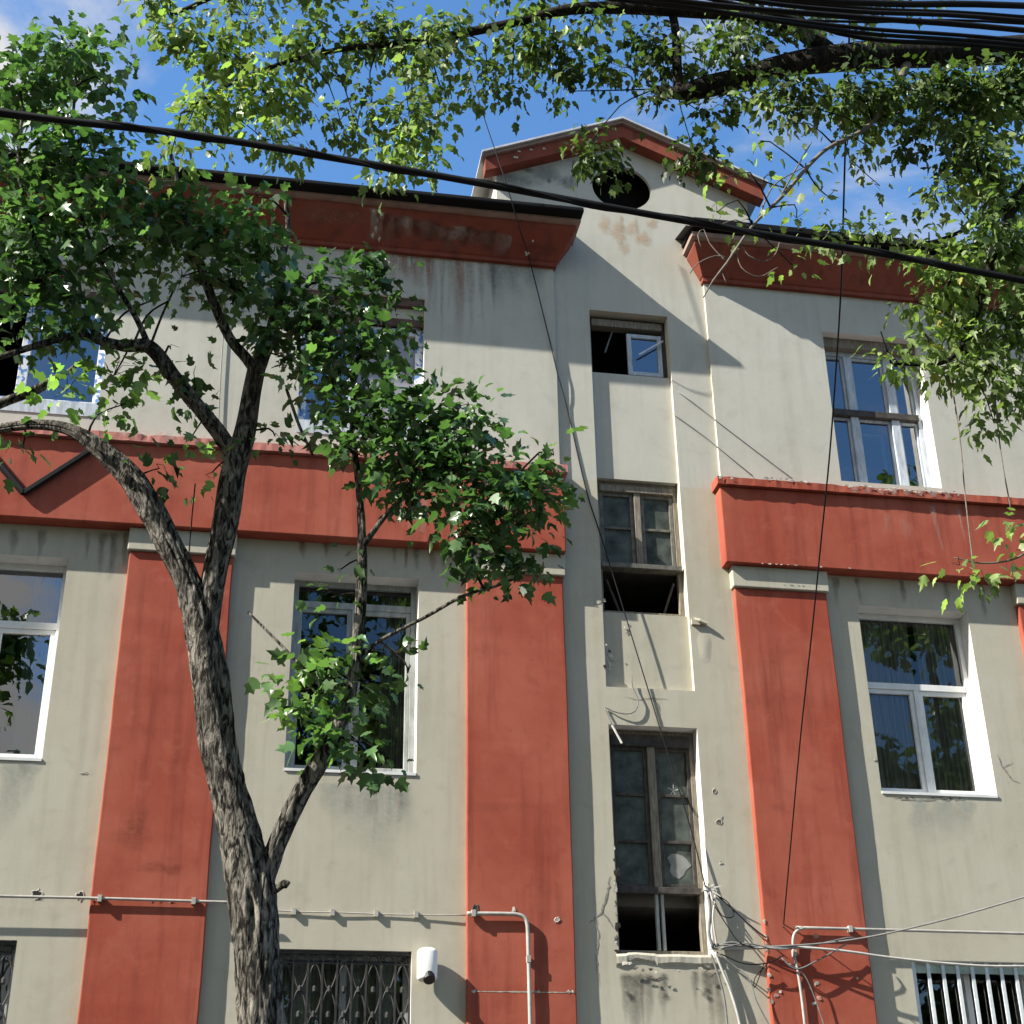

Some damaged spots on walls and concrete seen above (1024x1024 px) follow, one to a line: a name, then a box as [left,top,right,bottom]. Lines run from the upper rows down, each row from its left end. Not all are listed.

crack [589,876,613,984]